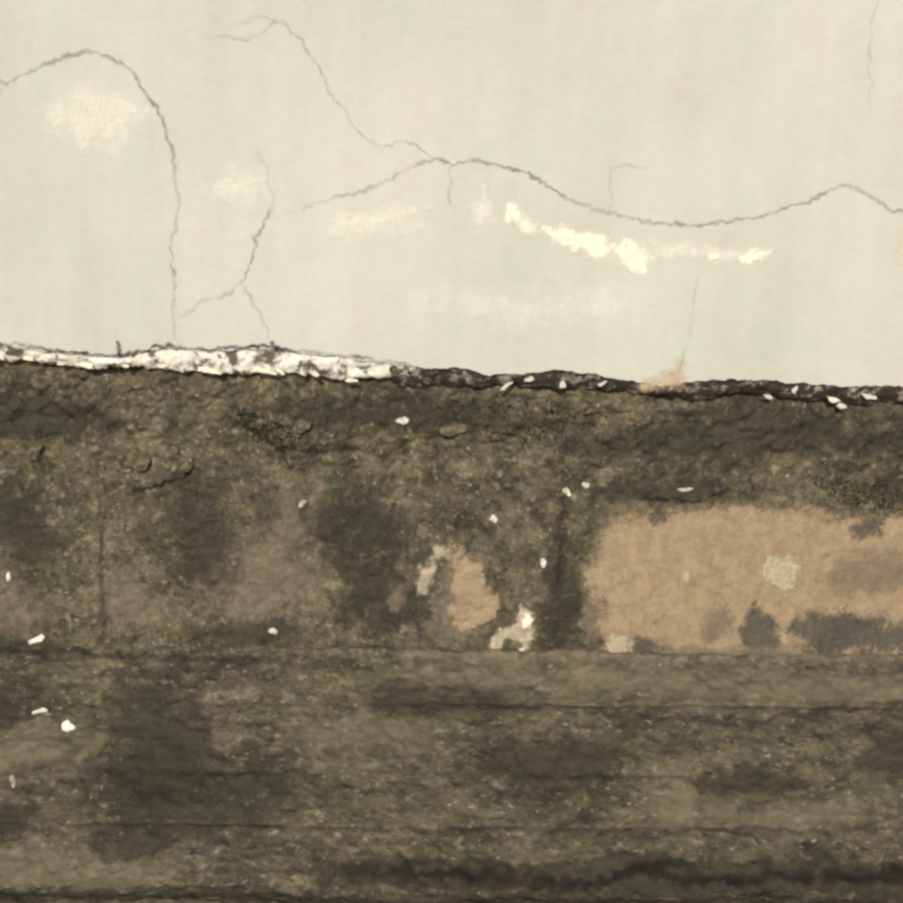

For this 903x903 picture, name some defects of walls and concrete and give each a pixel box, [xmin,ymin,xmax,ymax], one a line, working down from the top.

crack [44,342,174,357]
crack [205,341,292,353]
spalling [0,343,903,409]
peeling [387,585,405,611]
peeling [417,538,500,632]